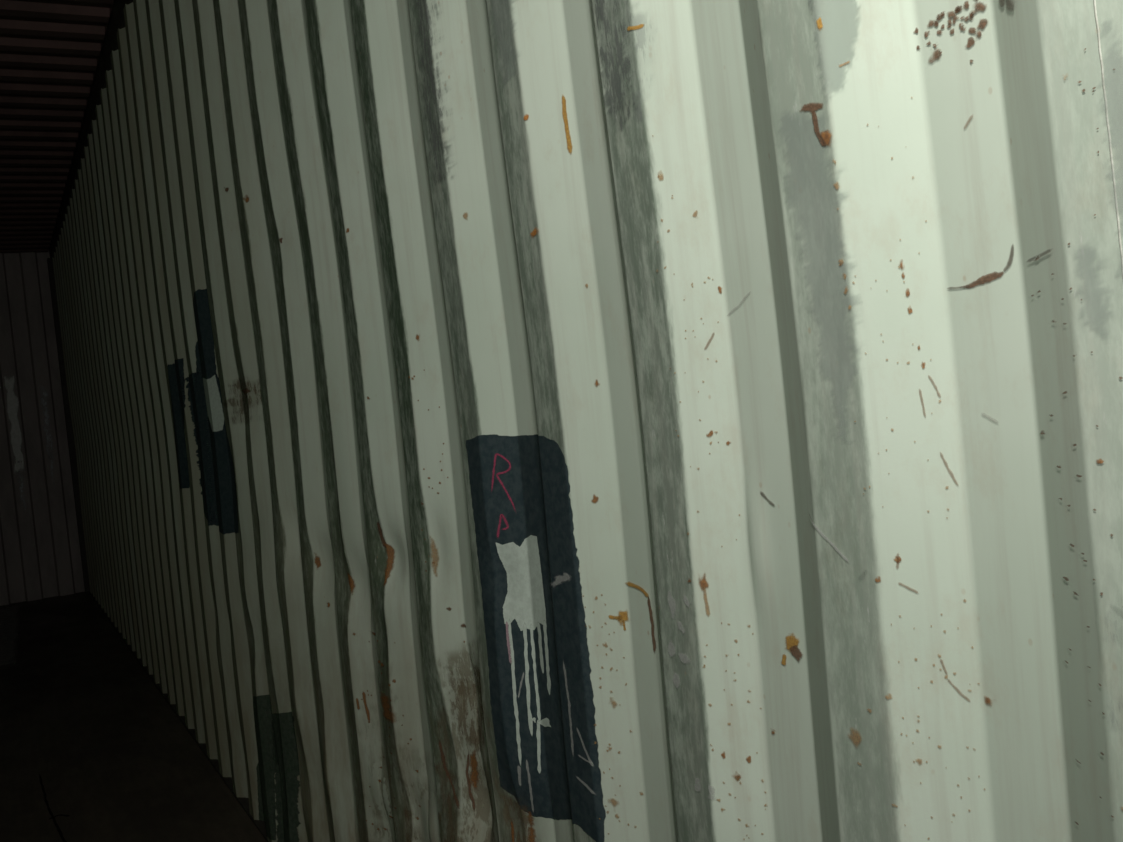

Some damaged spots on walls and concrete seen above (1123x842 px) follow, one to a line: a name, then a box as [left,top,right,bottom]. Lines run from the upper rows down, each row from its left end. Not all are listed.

rust [377,522,394,585]
rust [356,661,396,737]
rust [437,667,484,842]